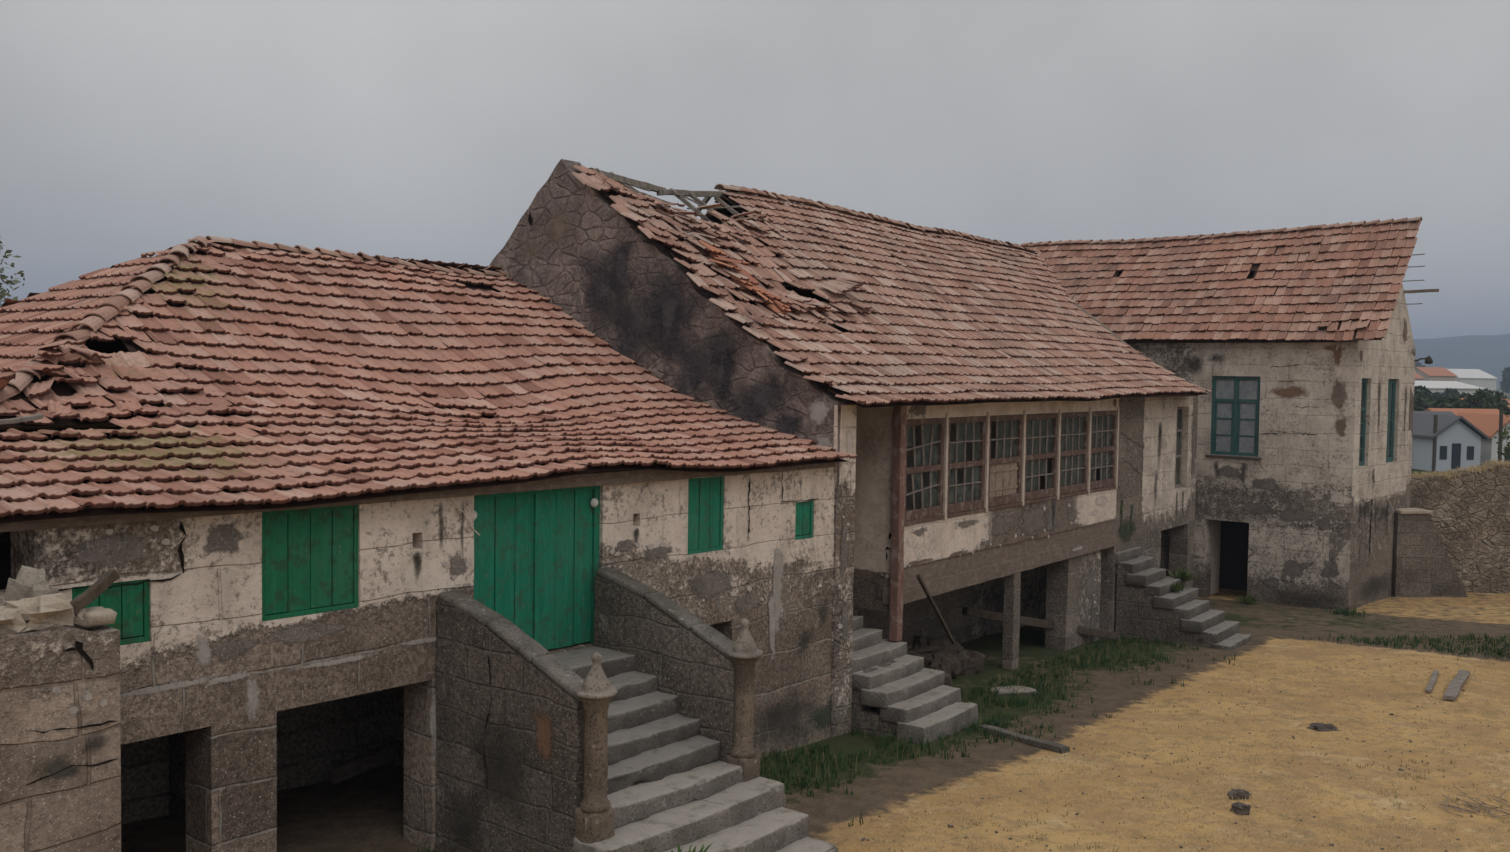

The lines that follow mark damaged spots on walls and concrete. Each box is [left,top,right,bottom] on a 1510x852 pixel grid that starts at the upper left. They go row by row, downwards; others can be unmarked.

peeling [1328,378,1350,442]
crack [170,522,187,579]
peeling [199,515,253,558]
leakage [768,549,784,660]